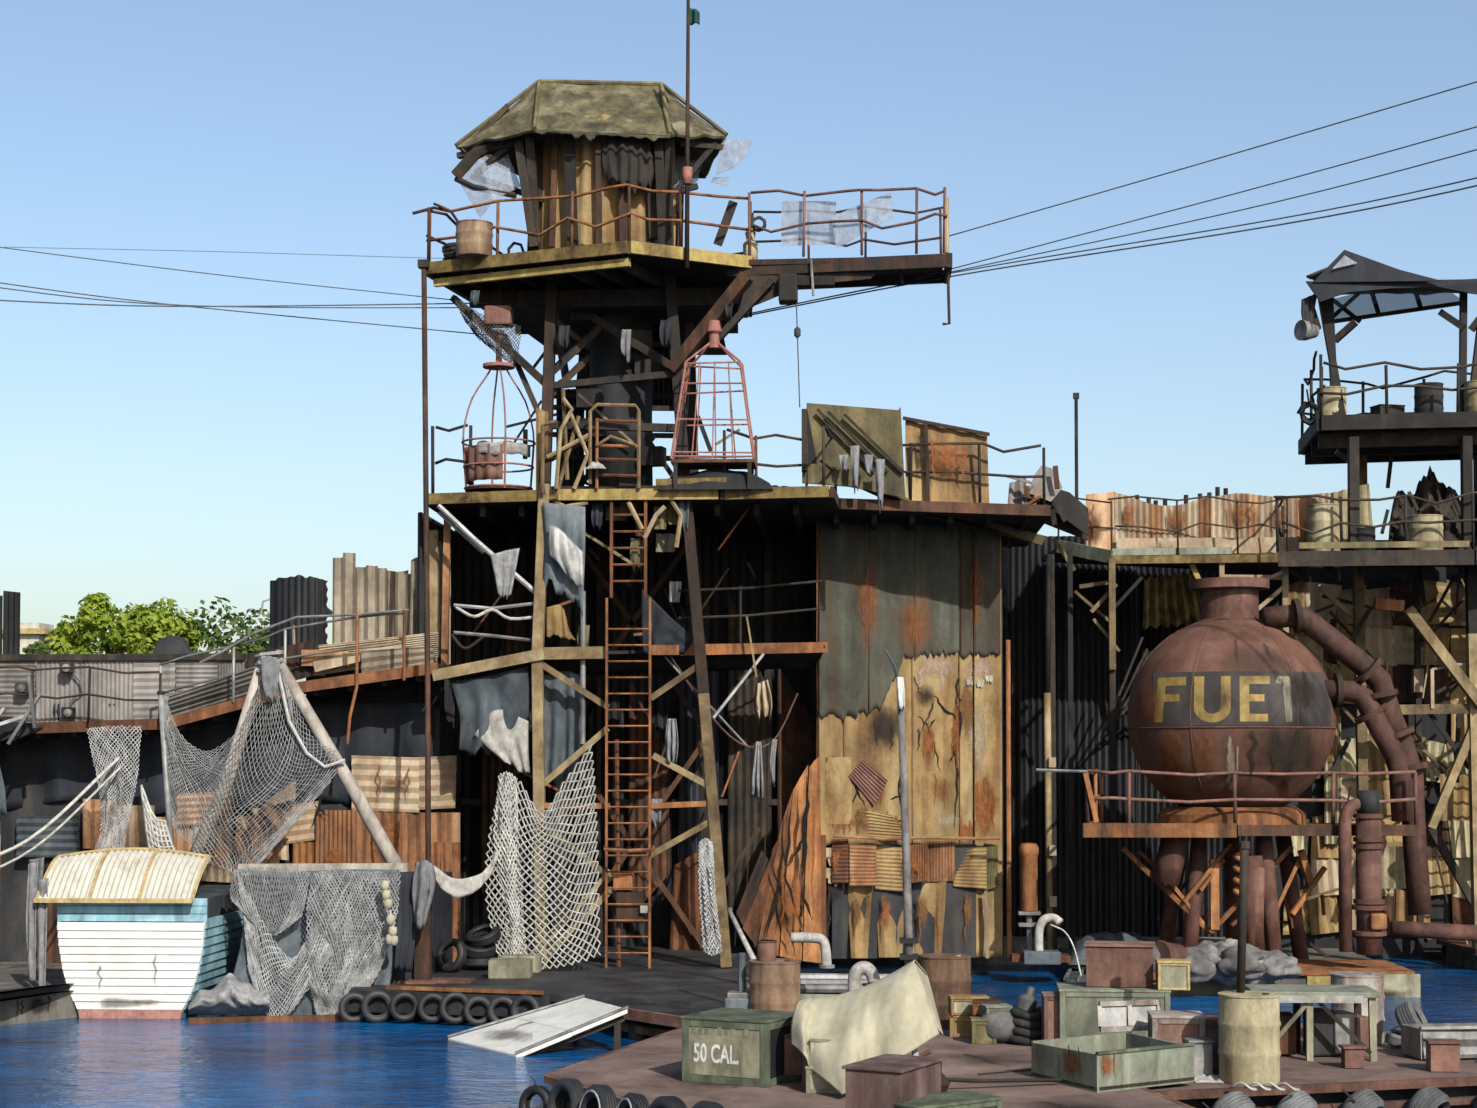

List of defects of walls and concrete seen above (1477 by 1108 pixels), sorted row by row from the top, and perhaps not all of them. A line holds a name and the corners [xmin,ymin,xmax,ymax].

corrosion [930,440,967,478]
corrosion [923,703,959,802]
corrosion [959,778,998,844]
corrosion [882,896,890,941]
corrosion [917,896,939,946]